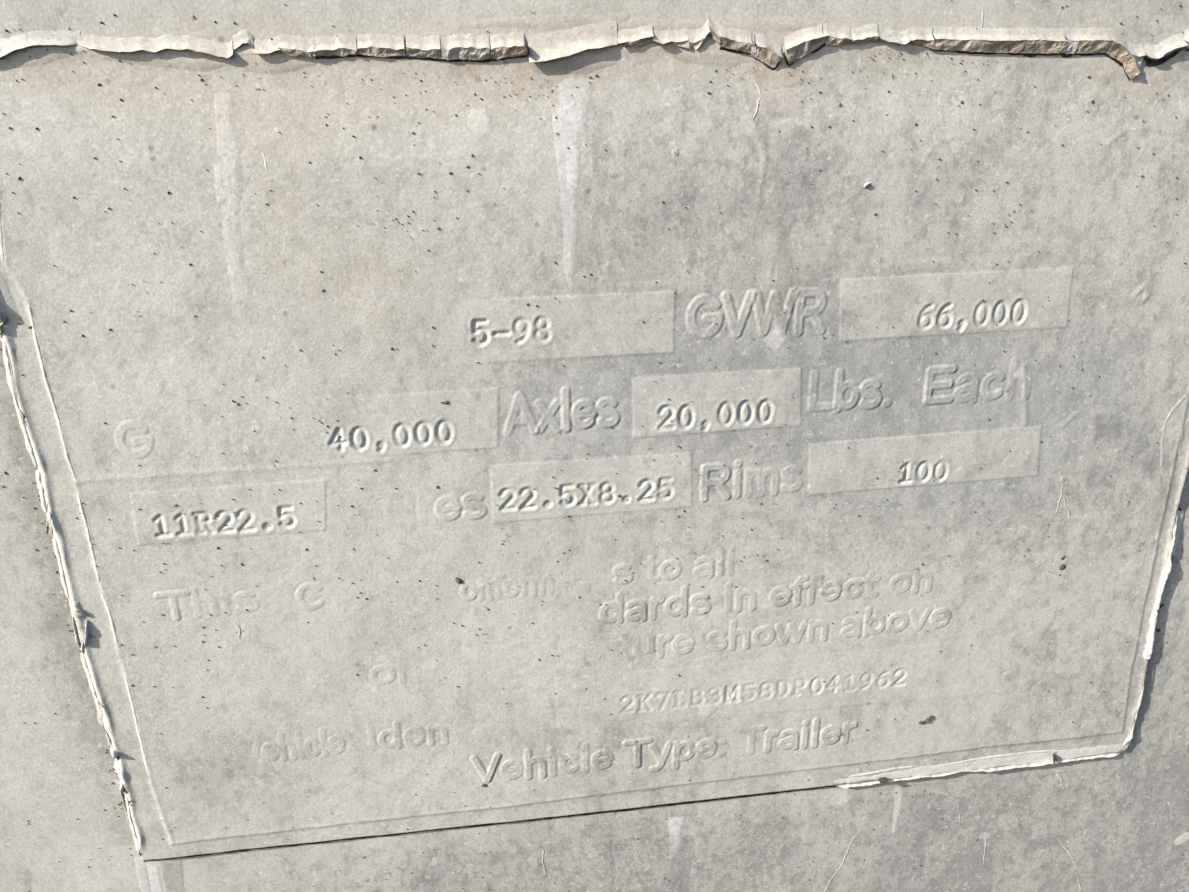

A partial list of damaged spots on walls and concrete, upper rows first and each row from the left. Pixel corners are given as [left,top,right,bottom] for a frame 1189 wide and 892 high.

peeling [0,18,1189,81]
peeling [1143,508,1184,688]
peeling [834,743,1128,788]